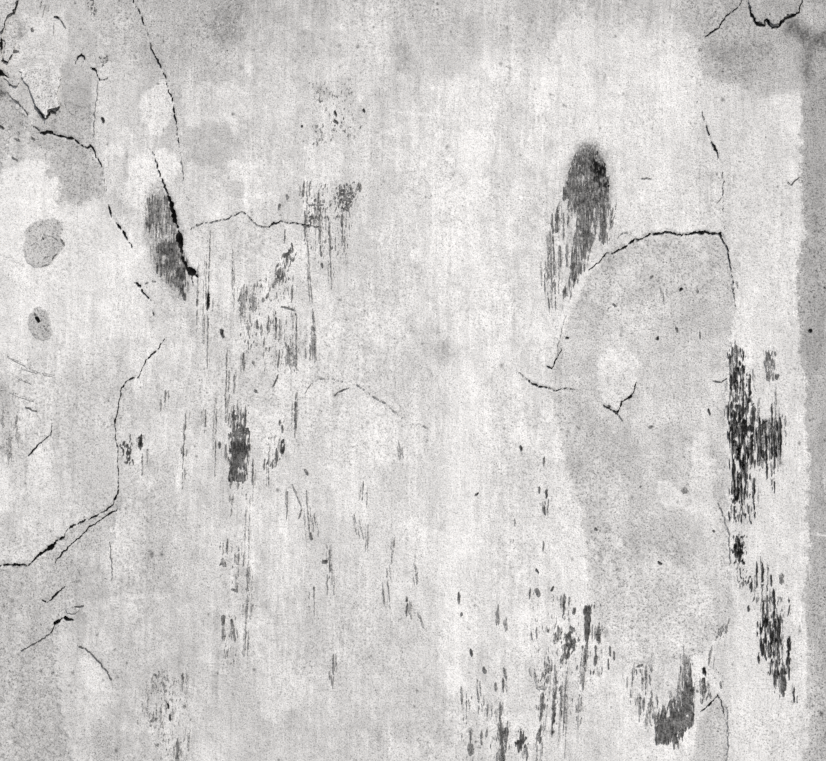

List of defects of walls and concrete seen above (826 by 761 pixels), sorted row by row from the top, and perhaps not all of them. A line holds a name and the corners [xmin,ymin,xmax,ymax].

peeling [0,0,18,63]
crack [705,0,803,37]
spalling [0,64,105,207]
crack [133,0,319,283]
leakage [540,152,614,299]
crack [588,101,736,307]
crack [0,338,165,566]
leakage [201,181,352,666]
leakage [726,341,787,518]
crack [21,605,84,651]
leakage [525,611,601,761]
leakage [733,533,798,703]